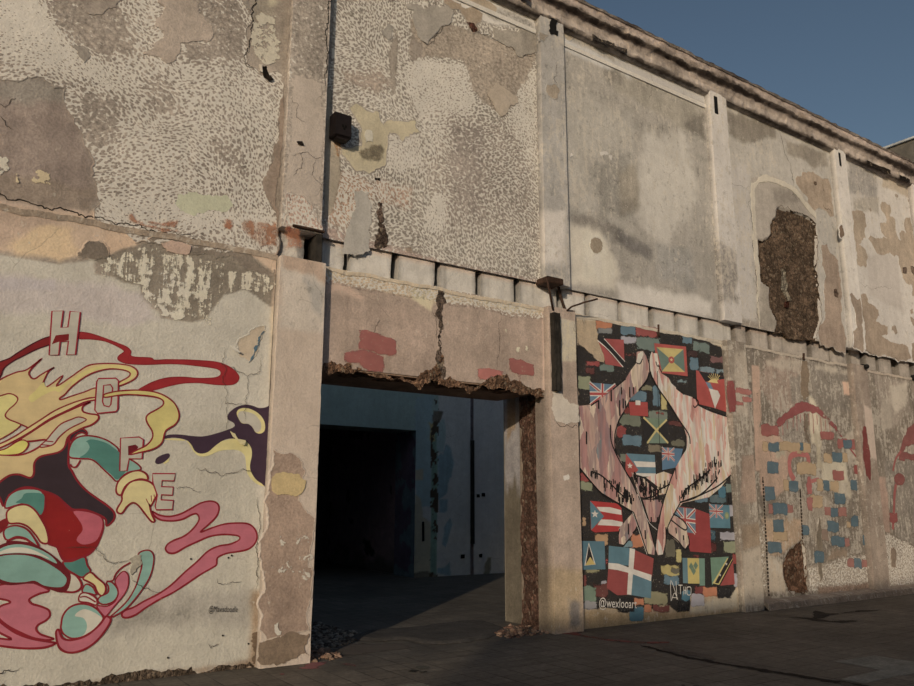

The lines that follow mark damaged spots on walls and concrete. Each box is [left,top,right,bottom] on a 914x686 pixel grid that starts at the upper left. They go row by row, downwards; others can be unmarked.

crack [244,0,261,74]
crack [0,193,197,239]
flaking render [0,0,324,326]
flaking render [340,103,421,181]
spalling [758,171,914,362]
spalling [322,290,579,424]
flaking render [24,449,316,686]
spalling [783,516,823,594]